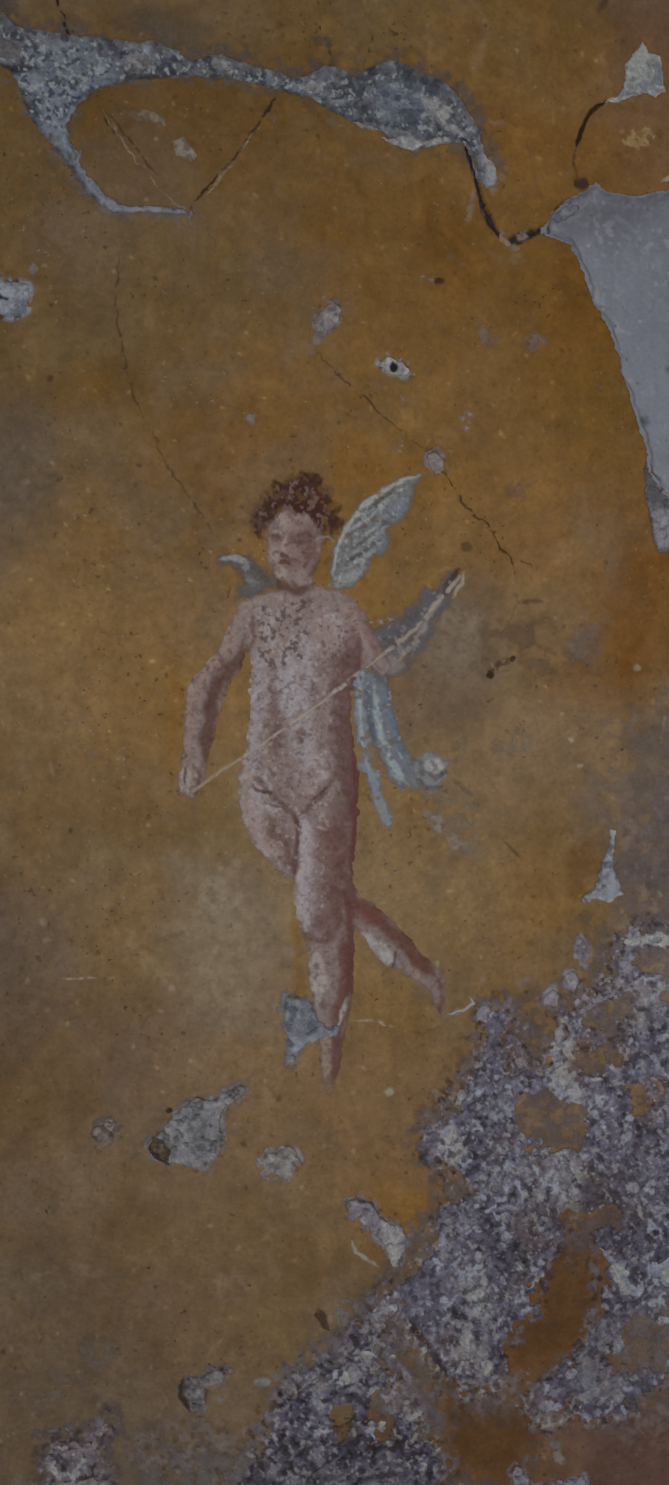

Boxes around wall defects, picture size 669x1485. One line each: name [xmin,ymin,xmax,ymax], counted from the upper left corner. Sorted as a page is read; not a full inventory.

crack [105,98,275,223]
flaking render [0,0,505,218]
crack [460,137,550,251]
crack [573,101,606,188]
flaking render [606,42,666,103]
peeling [622,126,655,149]
flaking render [0,263,36,321]
peeling [540,175,669,554]
crack [442,472,513,565]
flaking render [141,829,669,1485]
flaking render [33,1407,125,1485]